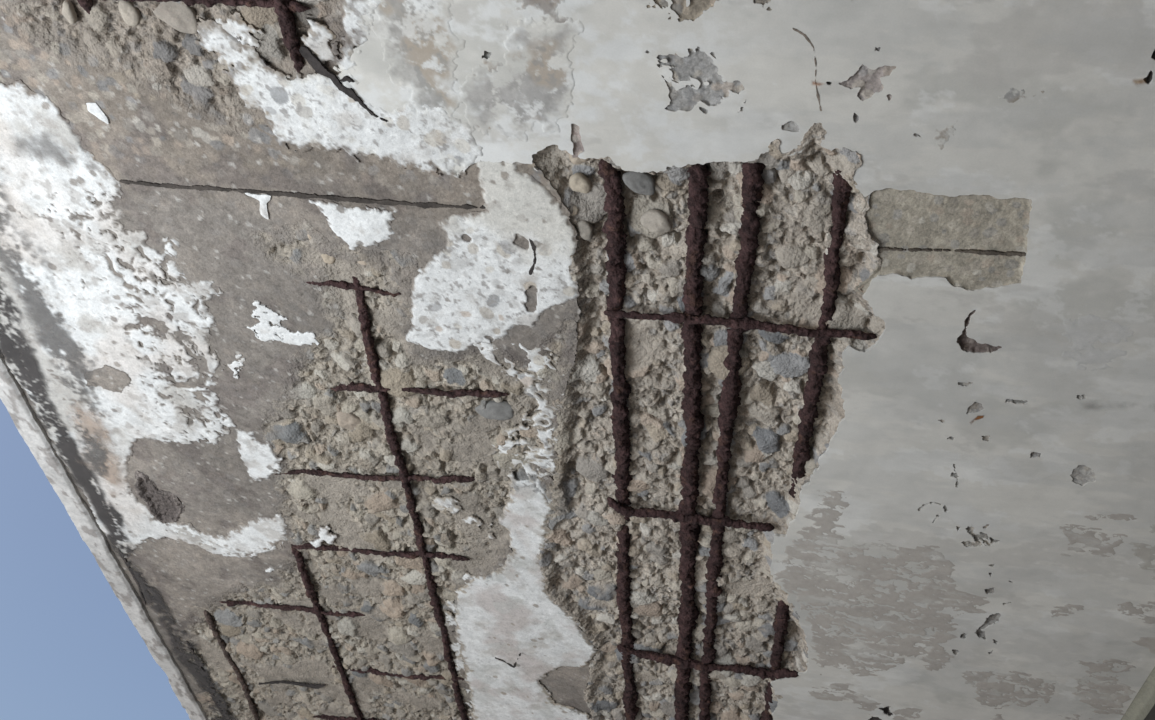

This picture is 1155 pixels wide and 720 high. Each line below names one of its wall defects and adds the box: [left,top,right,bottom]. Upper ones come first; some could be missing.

peeling [647,0,716,21]
peeling [646,46,746,113]
peeling [826,64,896,100]
leakage [19,140,68,164]
spalling [0,0,698,720]
spalling [690,120,1032,720]
leakage [0,245,237,720]
spalling [688,668,701,720]